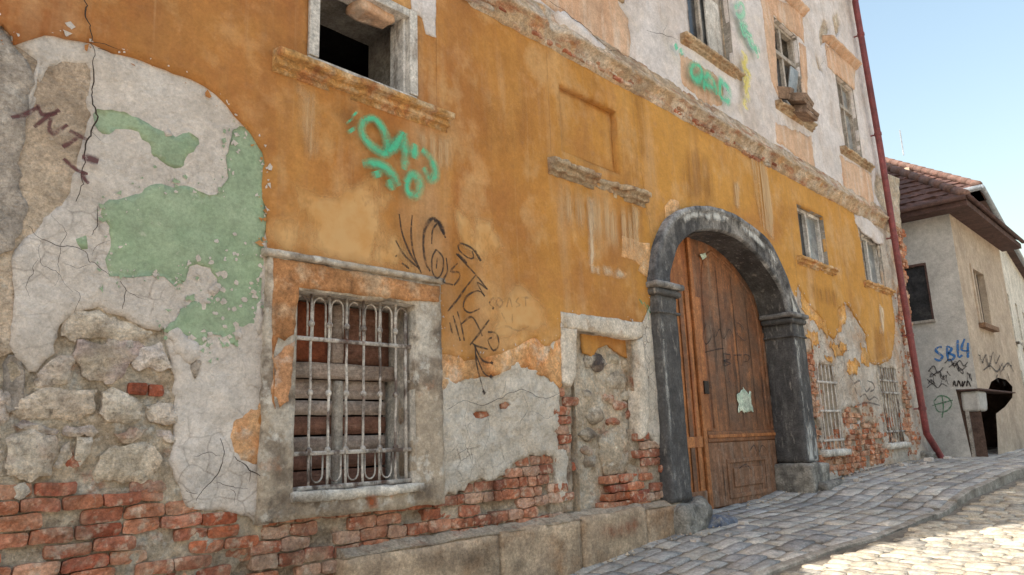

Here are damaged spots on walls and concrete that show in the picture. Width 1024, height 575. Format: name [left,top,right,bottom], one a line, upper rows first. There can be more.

crack [26,0,146,312]
crack [186,438,260,501]
peeling [0,13,579,575]
flaking render [626,297,663,503]
peeling [795,174,928,480]